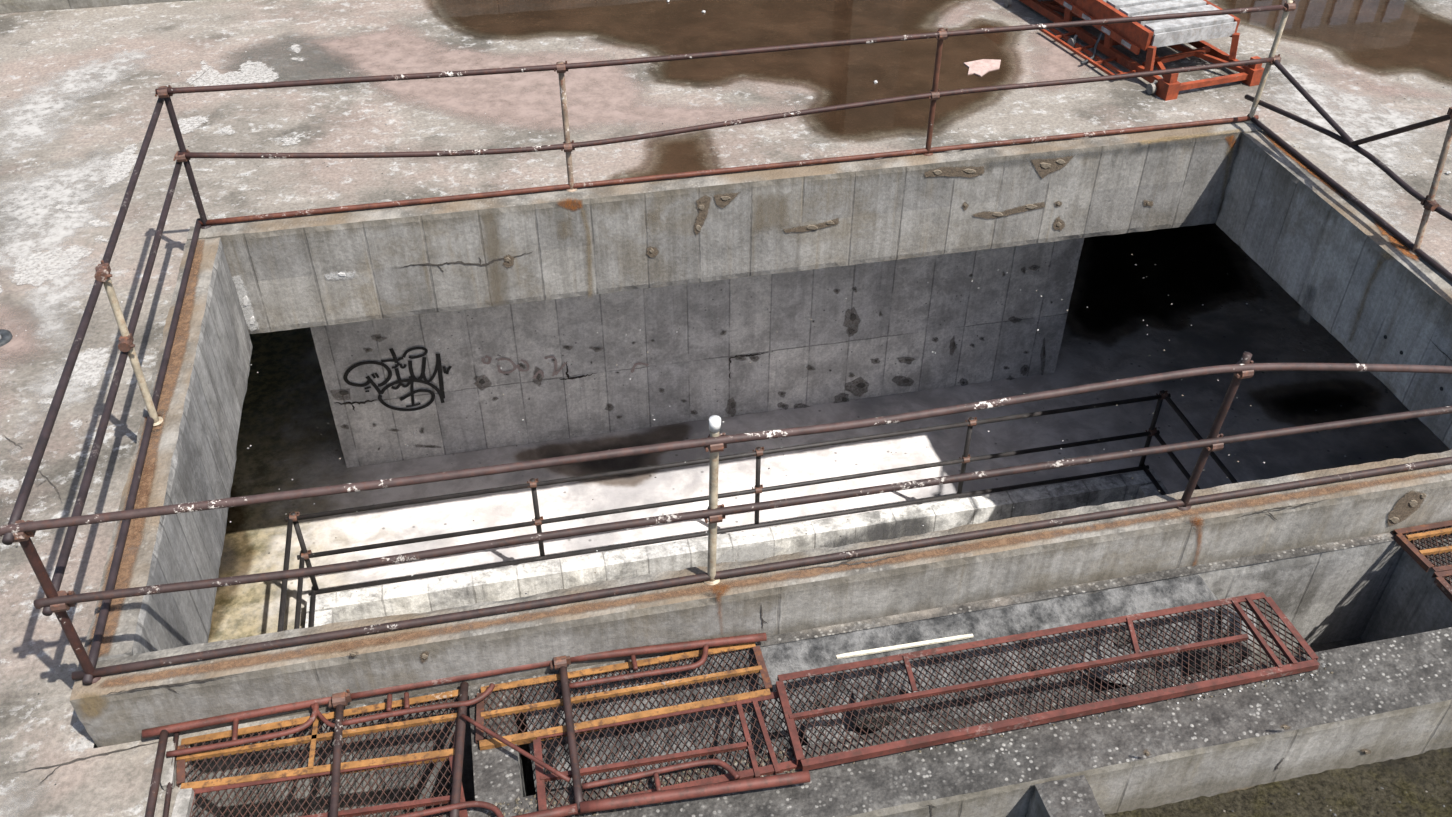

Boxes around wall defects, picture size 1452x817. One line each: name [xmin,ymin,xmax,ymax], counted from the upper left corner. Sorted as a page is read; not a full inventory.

water stain [232,28,790,129]
water stain [1033,34,1088,88]
spalling [694,192,740,235]
spalling [783,218,839,233]
spalling [962,201,1065,231]
spalling [1388,491,1426,526]
rust [82,470,1452,716]